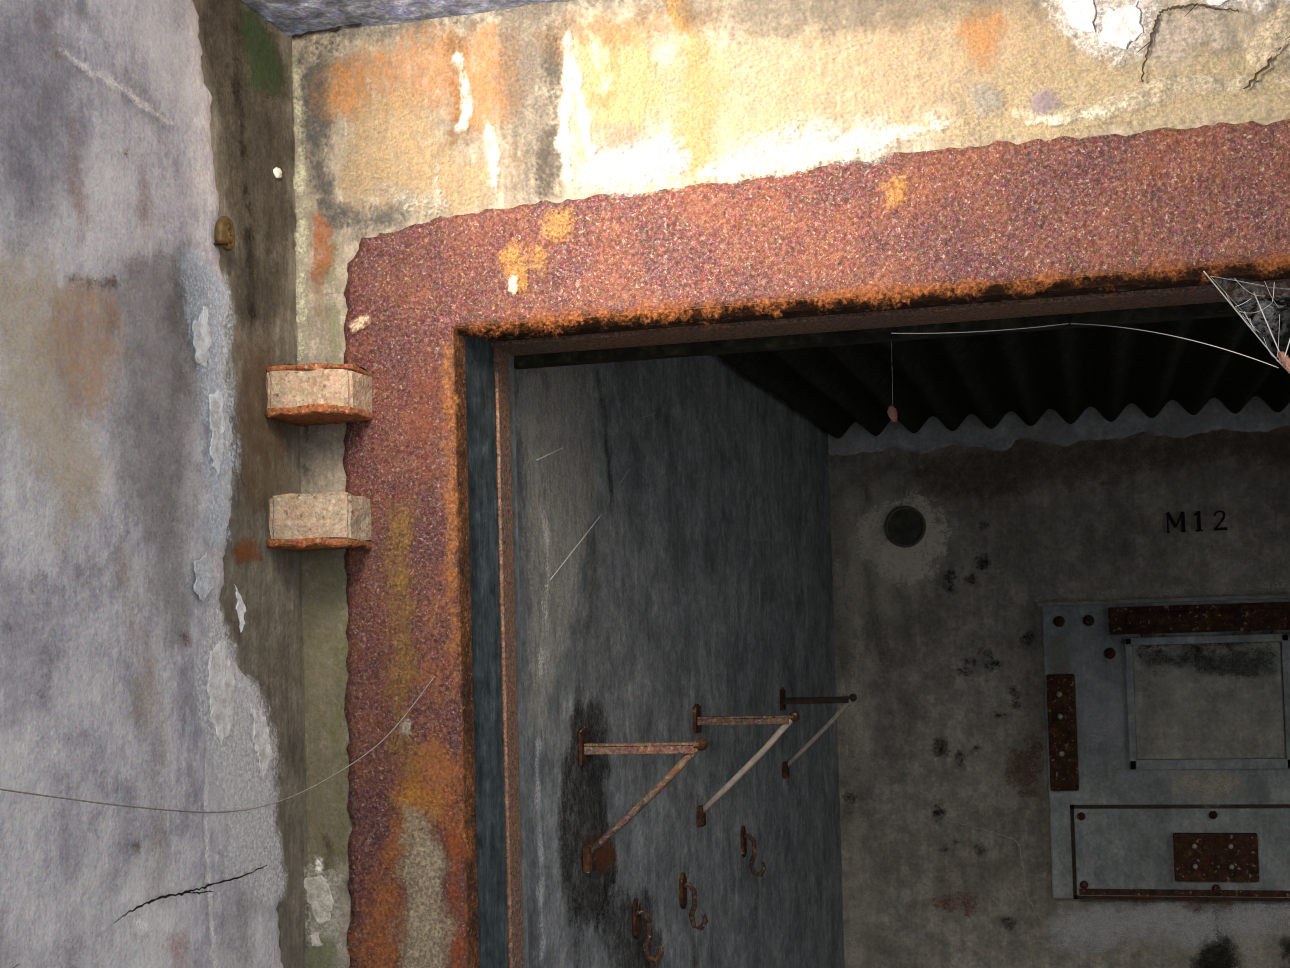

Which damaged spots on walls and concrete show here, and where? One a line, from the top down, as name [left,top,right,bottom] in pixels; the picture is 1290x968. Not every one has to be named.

crack [1137,3,1239,83]
crack [1243,36,1290,89]
corrosion [500,209,573,292]
damp [0,0,1290,643]
corrosion [470,279,990,330]
corrosion [265,350,470,968]
damp [558,697,664,968]
crack [114,865,267,923]
peeling [396,807,457,968]
damp [536,826,545,958]
corrosion [1074,888,1290,911]
damp [1190,902,1240,968]